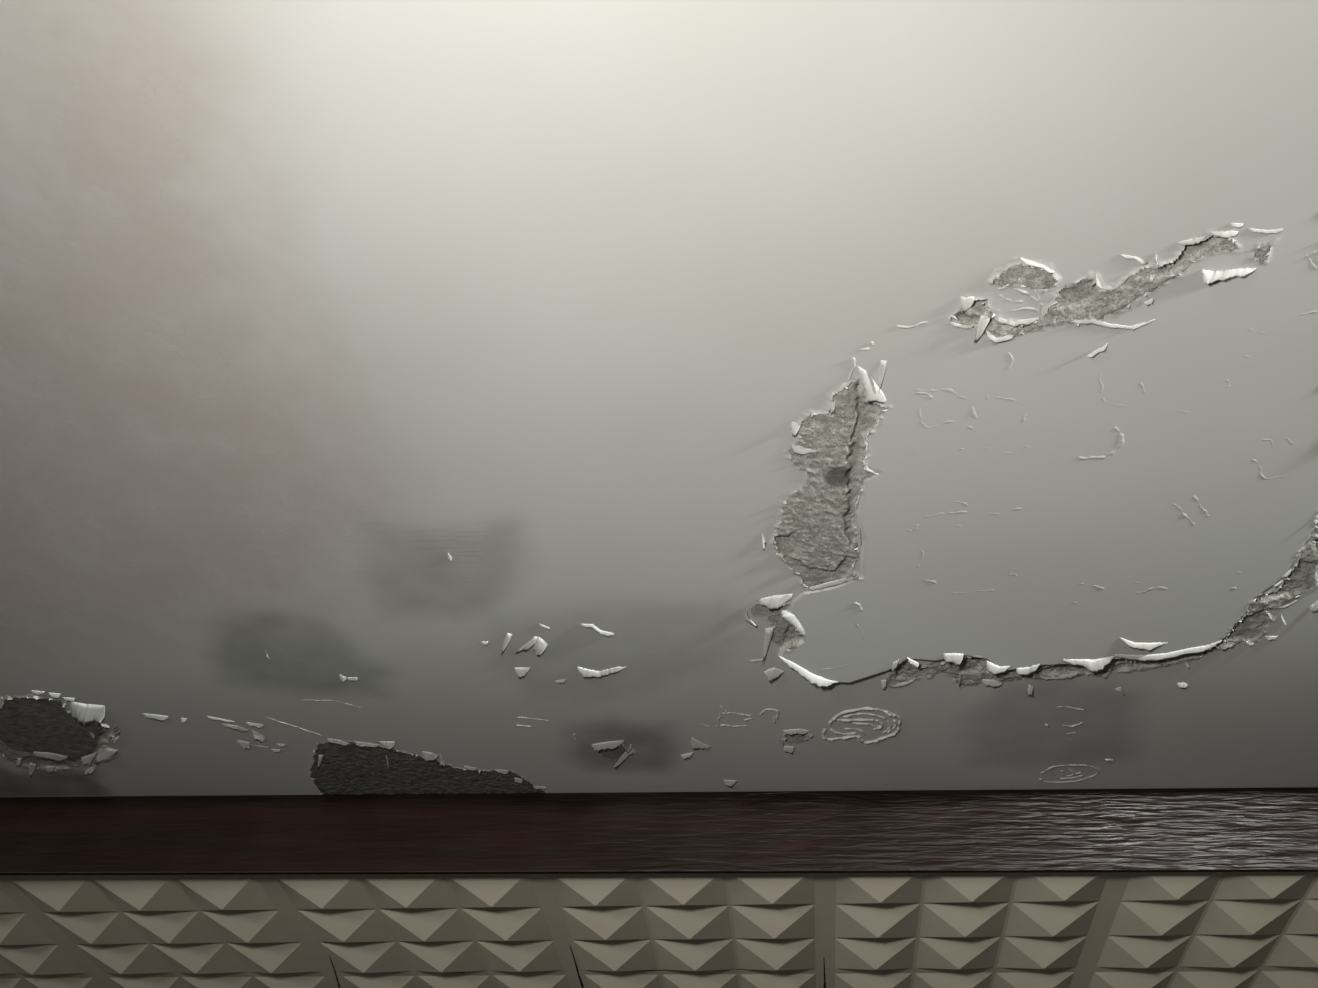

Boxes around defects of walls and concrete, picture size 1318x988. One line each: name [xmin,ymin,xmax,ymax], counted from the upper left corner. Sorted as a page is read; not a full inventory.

peeling [935,223,1289,358]
spalling [745,360,895,688]
peeling [481,624,550,678]
peeling [555,666,626,684]
peeling [580,624,614,637]
peeling [878,503,1318,696]
peeling [0,690,121,777]
spalling [303,738,551,795]